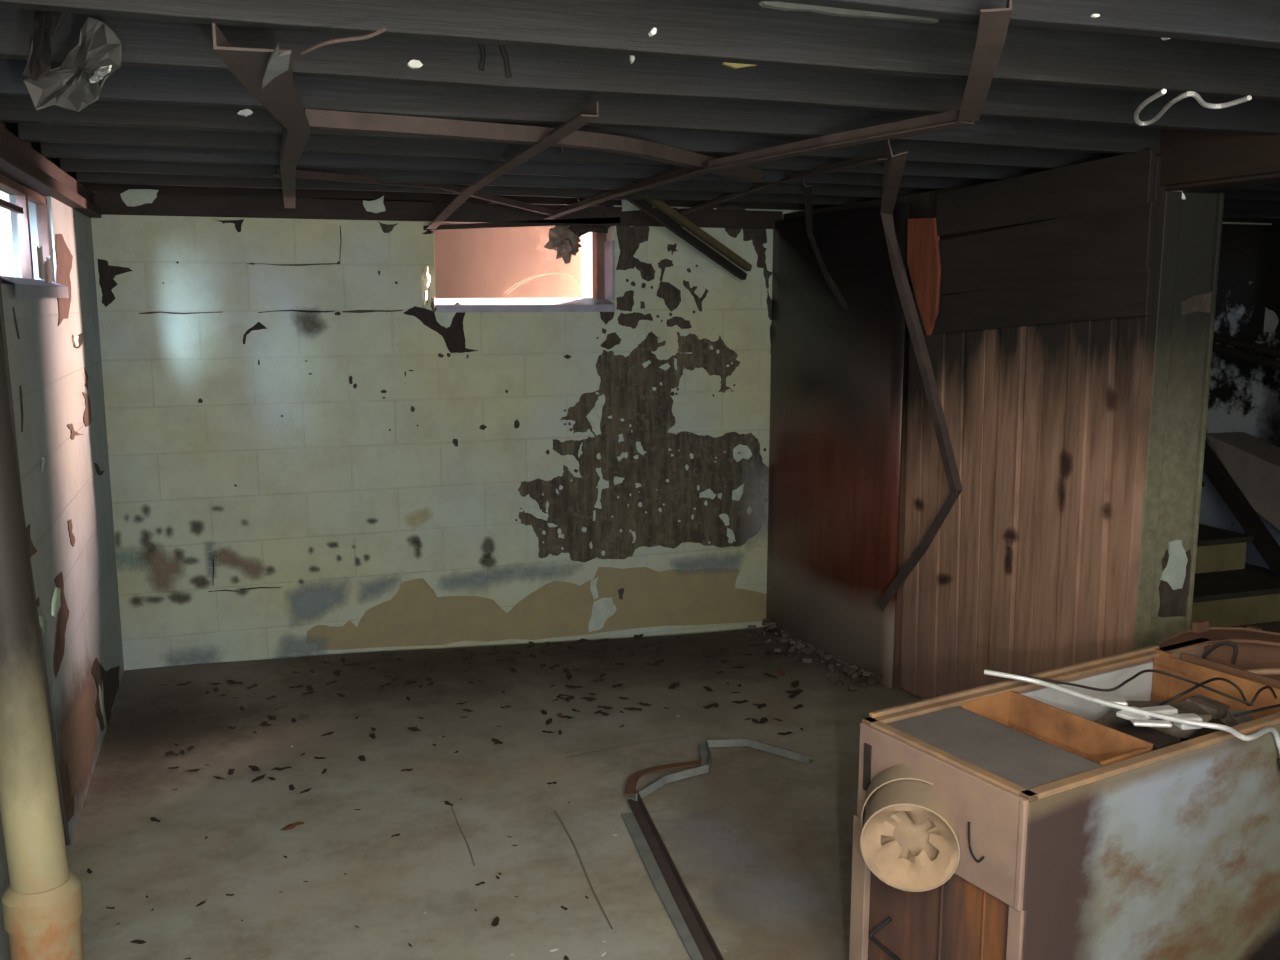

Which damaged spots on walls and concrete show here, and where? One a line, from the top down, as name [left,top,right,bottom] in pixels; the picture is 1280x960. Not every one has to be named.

peeling [120,189,159,207]
peeling [98,259,132,307]
peeling [66,368,91,440]
peeling [306,196,772,650]
peeling [67,519,75,547]
water stain [290,548,344,622]
water stain [409,513,426,557]
water stain [444,539,552,587]
peeling [1158,540,1191,617]
peeling [36,572,69,679]
water stain [282,639,323,658]
spalling [92,658,120,734]